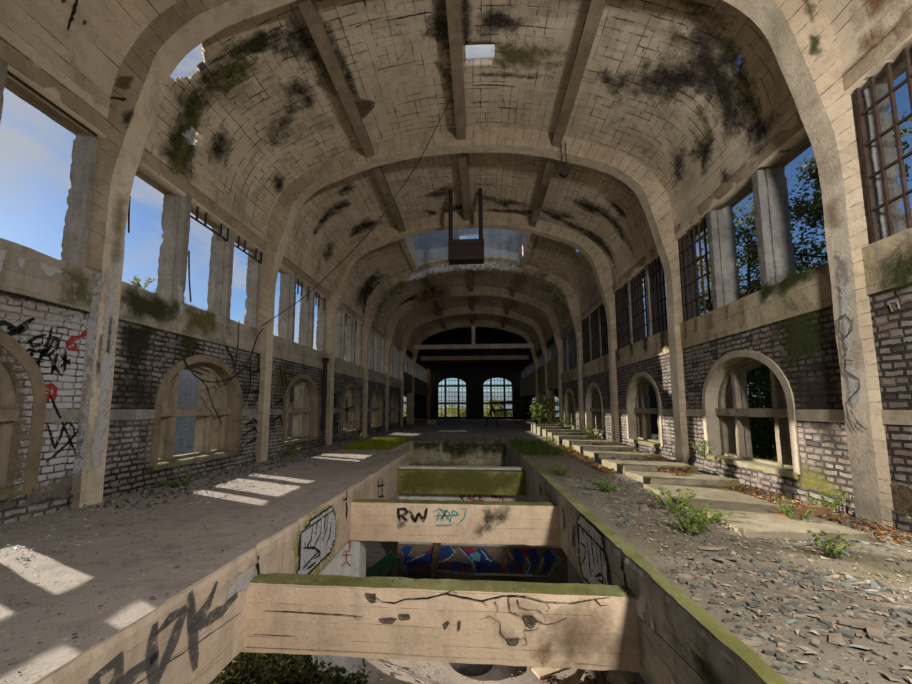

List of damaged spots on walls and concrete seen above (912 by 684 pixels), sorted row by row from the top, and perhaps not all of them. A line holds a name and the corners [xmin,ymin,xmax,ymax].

crack [67,0,78,31]
damp [426,0,450,49]
damp [461,0,470,45]
damp [483,10,521,35]
damp [272,81,313,144]
damp [269,21,334,93]
damp [323,23,357,99]
damp [598,27,774,153]
damp [211,133,231,160]
damp [692,139,713,173]
crack [264,548,629,660]
crack [137,613,240,684]